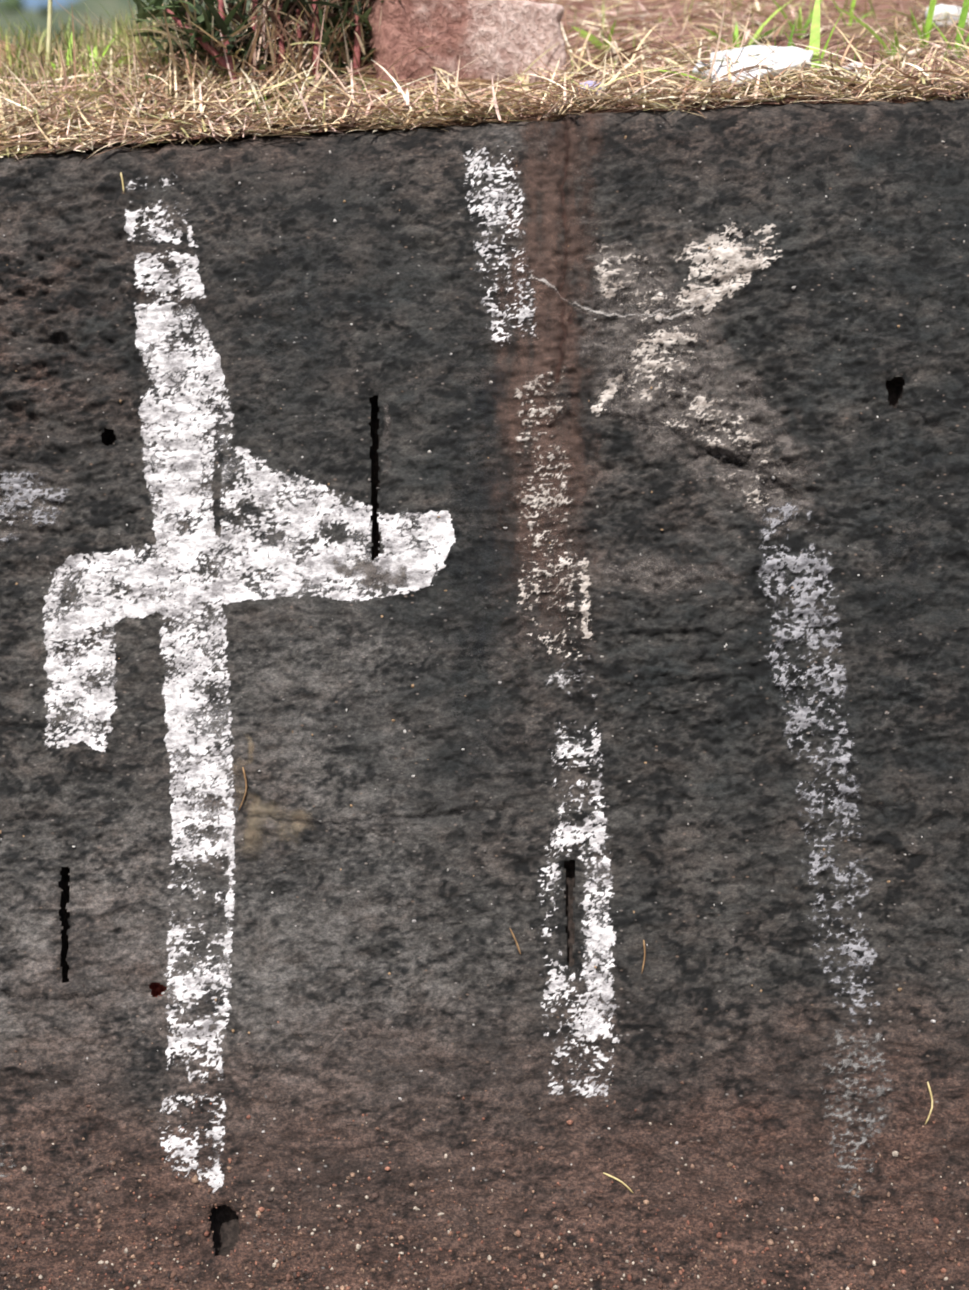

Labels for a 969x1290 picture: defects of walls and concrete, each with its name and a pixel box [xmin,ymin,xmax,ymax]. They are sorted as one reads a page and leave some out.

corrosion [486,112,602,633]